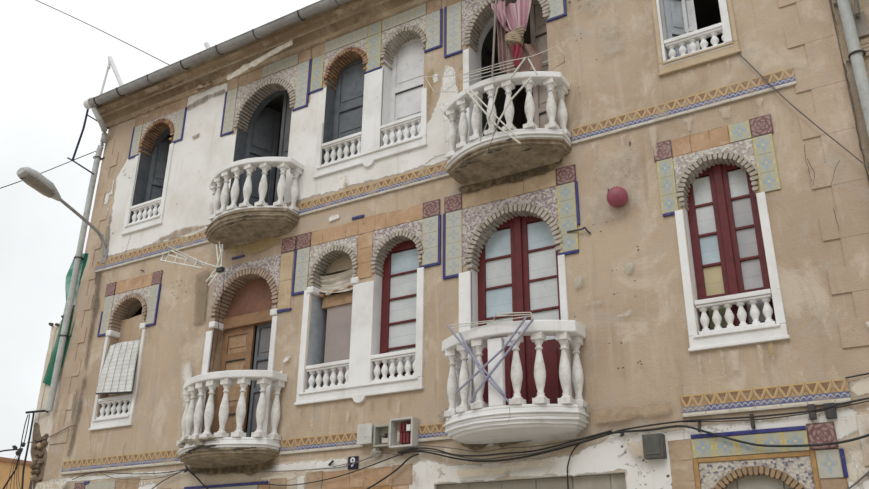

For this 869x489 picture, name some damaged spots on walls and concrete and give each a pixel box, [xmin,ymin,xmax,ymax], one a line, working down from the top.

peeling [432,65,463,92]
leakage [85,272,101,363]
leakage [67,377,85,456]
spalling [30,433,66,489]
peeling [457,459,553,478]
peeling [621,439,655,489]